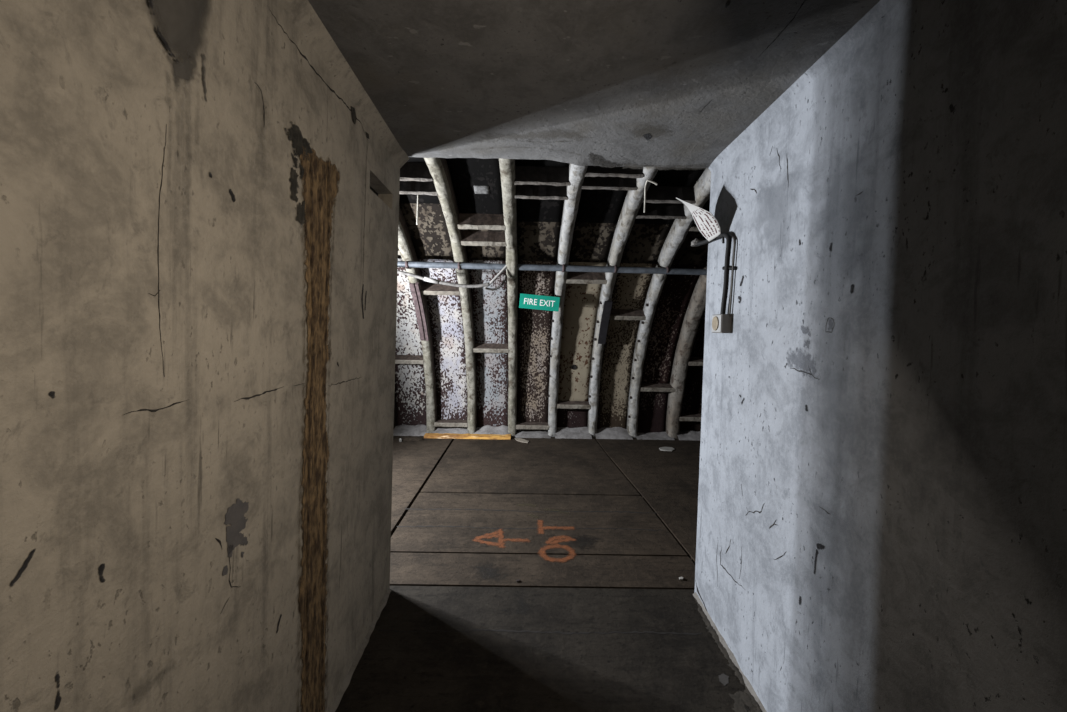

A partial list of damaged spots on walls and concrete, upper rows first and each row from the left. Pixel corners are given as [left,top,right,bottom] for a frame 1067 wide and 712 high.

crack [234,384,301,402]
crack [124,400,187,415]
rust [298,147,340,712]